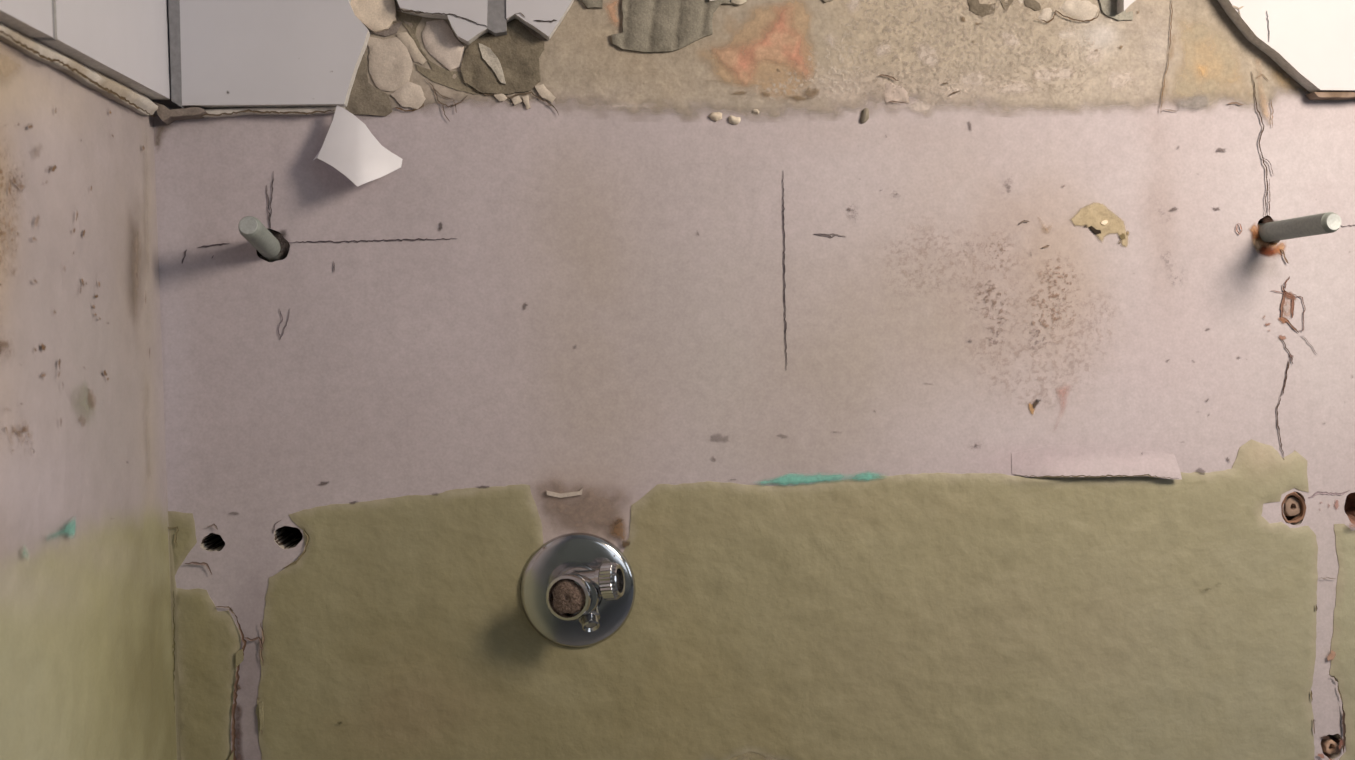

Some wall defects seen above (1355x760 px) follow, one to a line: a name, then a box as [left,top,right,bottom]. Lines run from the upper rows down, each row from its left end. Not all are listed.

spalling [350,0,402,33]
spalling [364,44,402,109]
spalling [370,14,497,106]
spalling [522,0,1307,117]
crack [1251,71,1274,220]
corrosion [1236,218,1289,264]
peeling [153,82,1355,760]
crack [1264,277,1317,458]